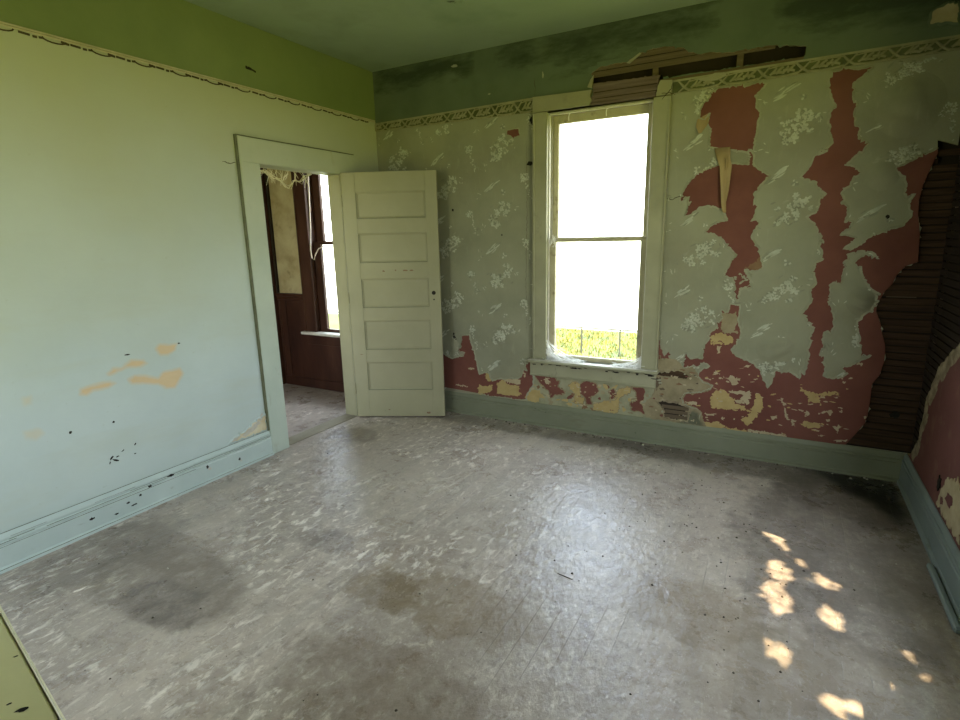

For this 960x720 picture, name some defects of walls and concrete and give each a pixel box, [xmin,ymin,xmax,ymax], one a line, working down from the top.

flaking render [587,45,806,88]
flaking render [443,67,960,462]
peeling [75,340,187,399]
flaking render [936,475,960,545]